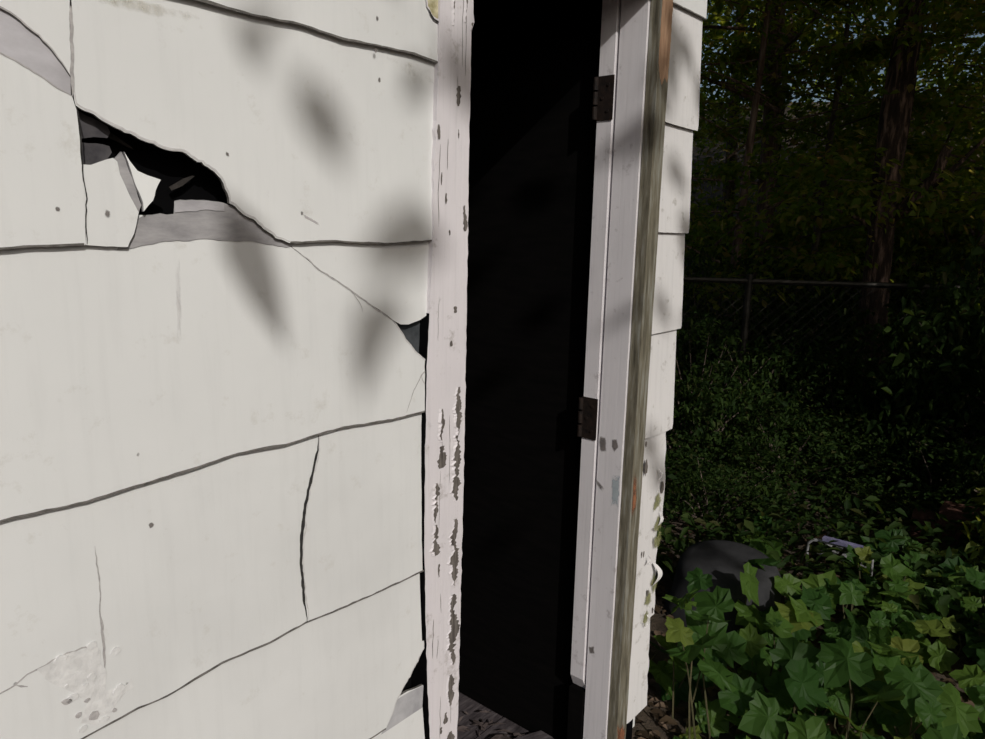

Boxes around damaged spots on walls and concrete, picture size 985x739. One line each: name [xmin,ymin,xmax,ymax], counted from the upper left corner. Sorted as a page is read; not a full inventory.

peeling [451,0,474,106]
spalling [0,6,294,250]
peeling [437,124,448,210]
crack [291,246,393,321]
crack [0,550,106,694]
crack [300,435,320,619]
peeling [381,387,462,739]
peeling [61,693,117,723]